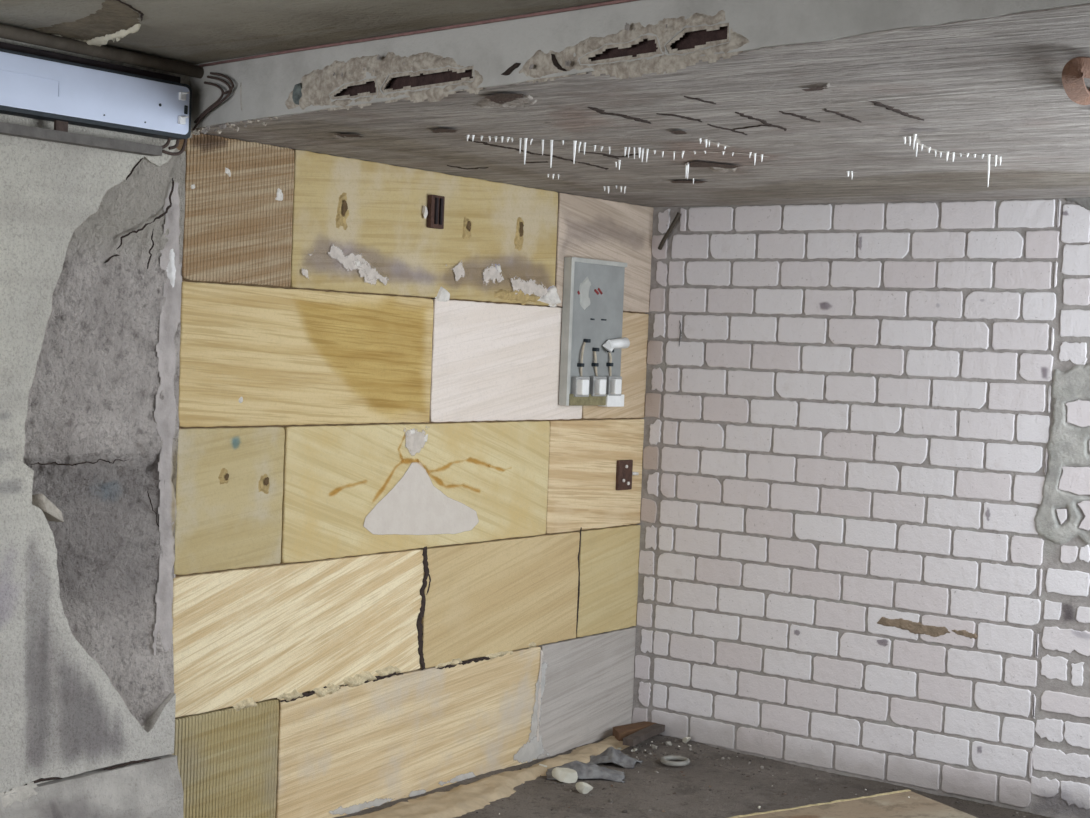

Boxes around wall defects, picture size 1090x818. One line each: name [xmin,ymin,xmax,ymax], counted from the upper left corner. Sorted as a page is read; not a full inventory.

flaking render [29,0,144,46]
flaking render [501,10,749,83]
flaking render [285,52,537,113]
crack [587,96,924,135]
damp [467,135,768,184]
spalling [23,148,195,726]
crack [575,527,583,634]
crack [416,546,431,670]
spalling [277,665,403,703]
spalling [435,651,513,669]
crack [24,777,62,786]
crack [104,758,161,770]